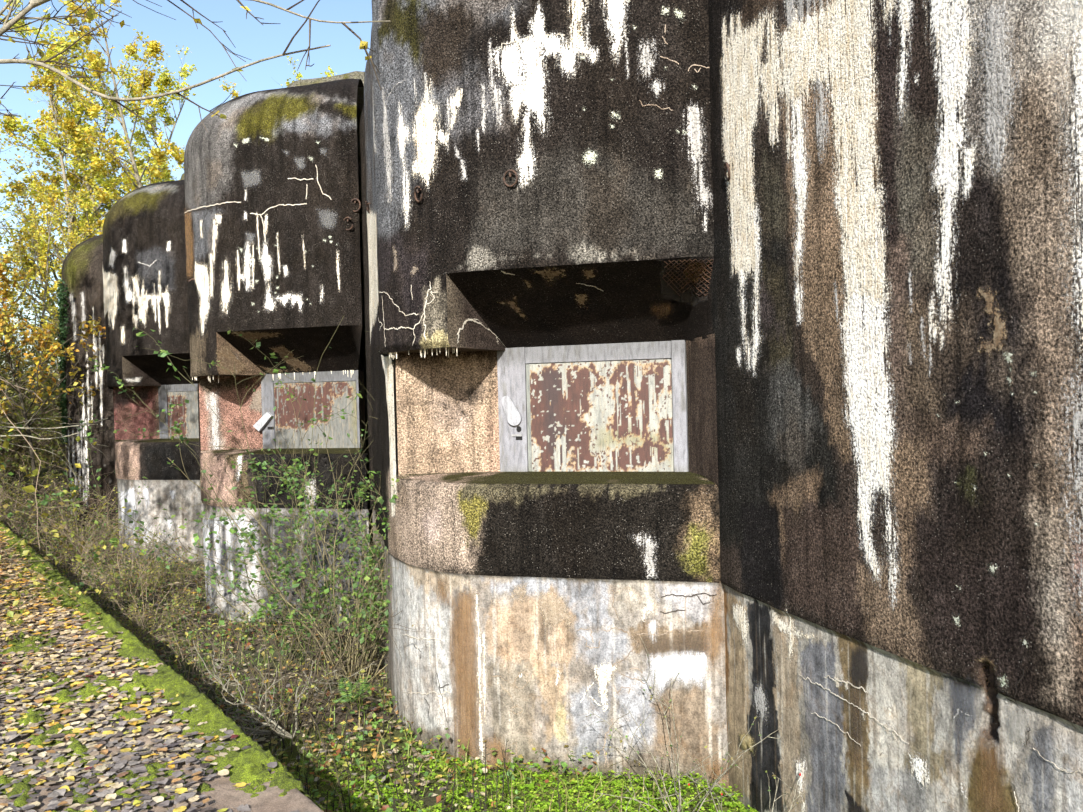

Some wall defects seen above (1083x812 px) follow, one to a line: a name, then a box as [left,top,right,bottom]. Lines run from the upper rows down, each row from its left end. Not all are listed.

crack [184,165,332,242]
efflorescence [373,73,467,227]
efflorescence [476,0,598,185]
efflorescence [603,0,661,95]
damp [683,104,712,231]
efflorescence [68,239,170,512]
crack [378,281,438,347]
crack [457,318,503,344]
damp [720,0,1019,606]
rust [438,584,477,760]
crack [577,589,717,768]
crack [997,657,1083,773]